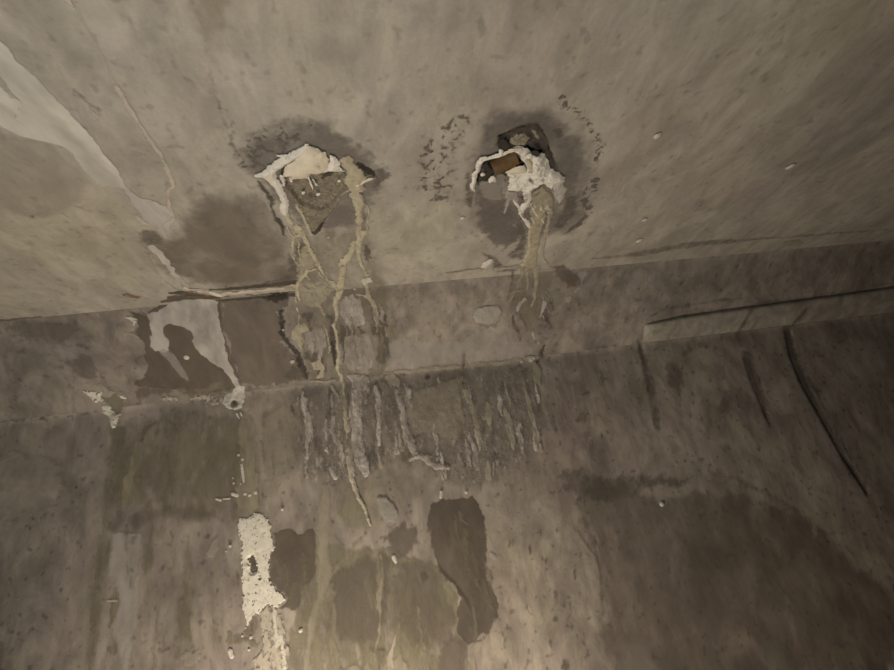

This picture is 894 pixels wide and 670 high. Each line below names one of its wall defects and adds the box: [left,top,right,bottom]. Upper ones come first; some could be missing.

crack [169,281,297,301]
leakage [0,41,469,527]
leakage [446,95,602,319]
leakage [107,526,152,626]
peeling [227,513,290,670]
leakage [269,485,498,670]